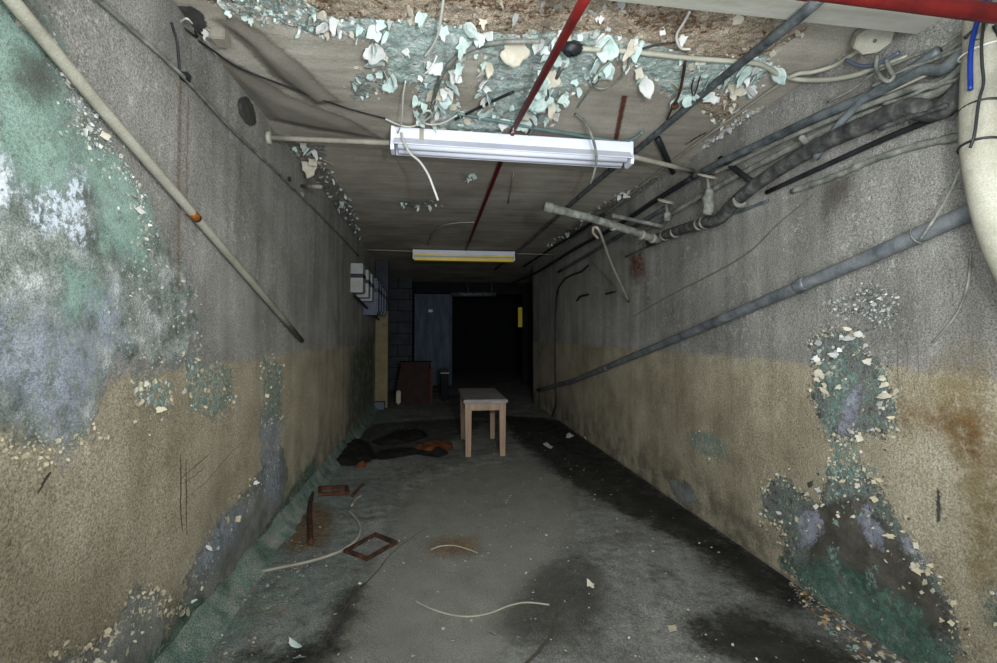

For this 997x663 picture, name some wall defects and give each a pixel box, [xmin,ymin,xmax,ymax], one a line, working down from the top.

peeling [208,0,808,150]
water stain [0,154,90,251]
peeling [0,0,238,493]
water stain [0,314,94,436]
peeling [259,350,285,430]
peeling [40,445,316,663]
water stain [248,586,362,663]
water stain [506,416,816,608]
water stain [687,608,861,663]
peeling [755,279,979,663]